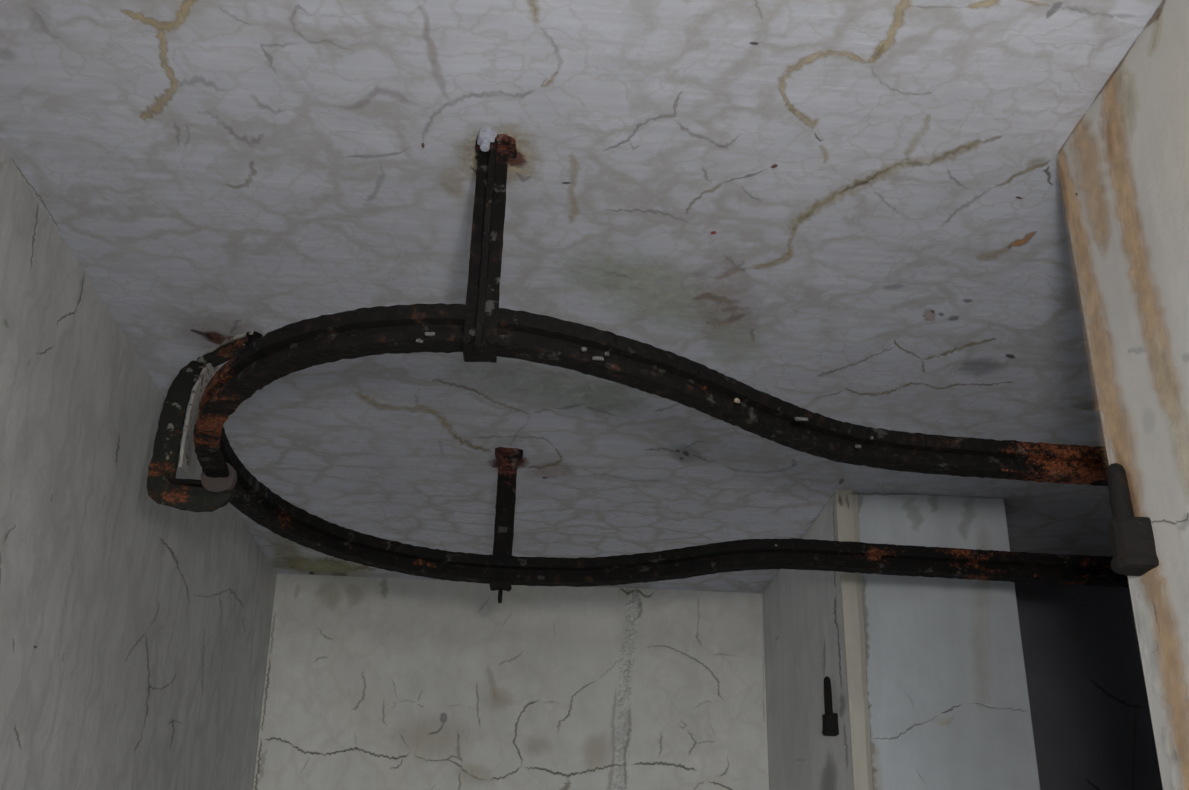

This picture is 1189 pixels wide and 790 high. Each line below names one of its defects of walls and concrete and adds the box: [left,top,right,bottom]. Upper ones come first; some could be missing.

crack [969,0,998,8]
crack [122,0,194,119]
crack [781,0,909,111]
rust [507,142,529,179]
crack [844,168,889,191]
crack [1001,163,1052,185]
crack [39,278,84,354]
crack [847,338,994,395]
crack [255,660,407,790]
crack [492,702,732,790]